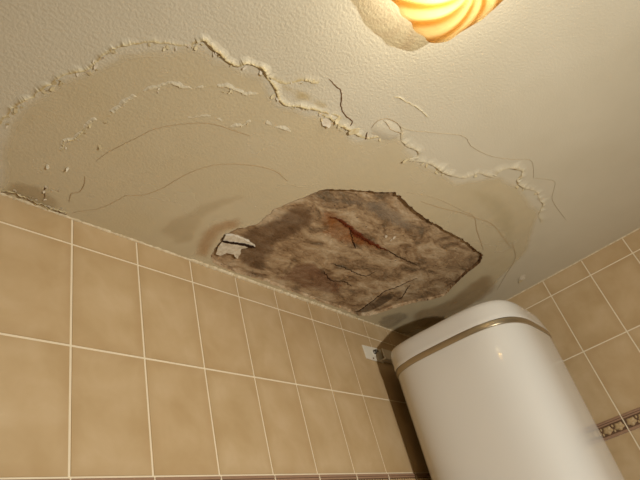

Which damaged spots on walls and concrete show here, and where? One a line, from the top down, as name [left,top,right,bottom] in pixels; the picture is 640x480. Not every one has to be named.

peeling [0,33,381,151]
crack [329,79,353,131]
peeling [397,125,550,224]
water stain [244,212,308,265]
spalling [211,189,483,317]
crack [324,264,372,287]
rust [328,217,388,251]
crack [356,250,417,312]